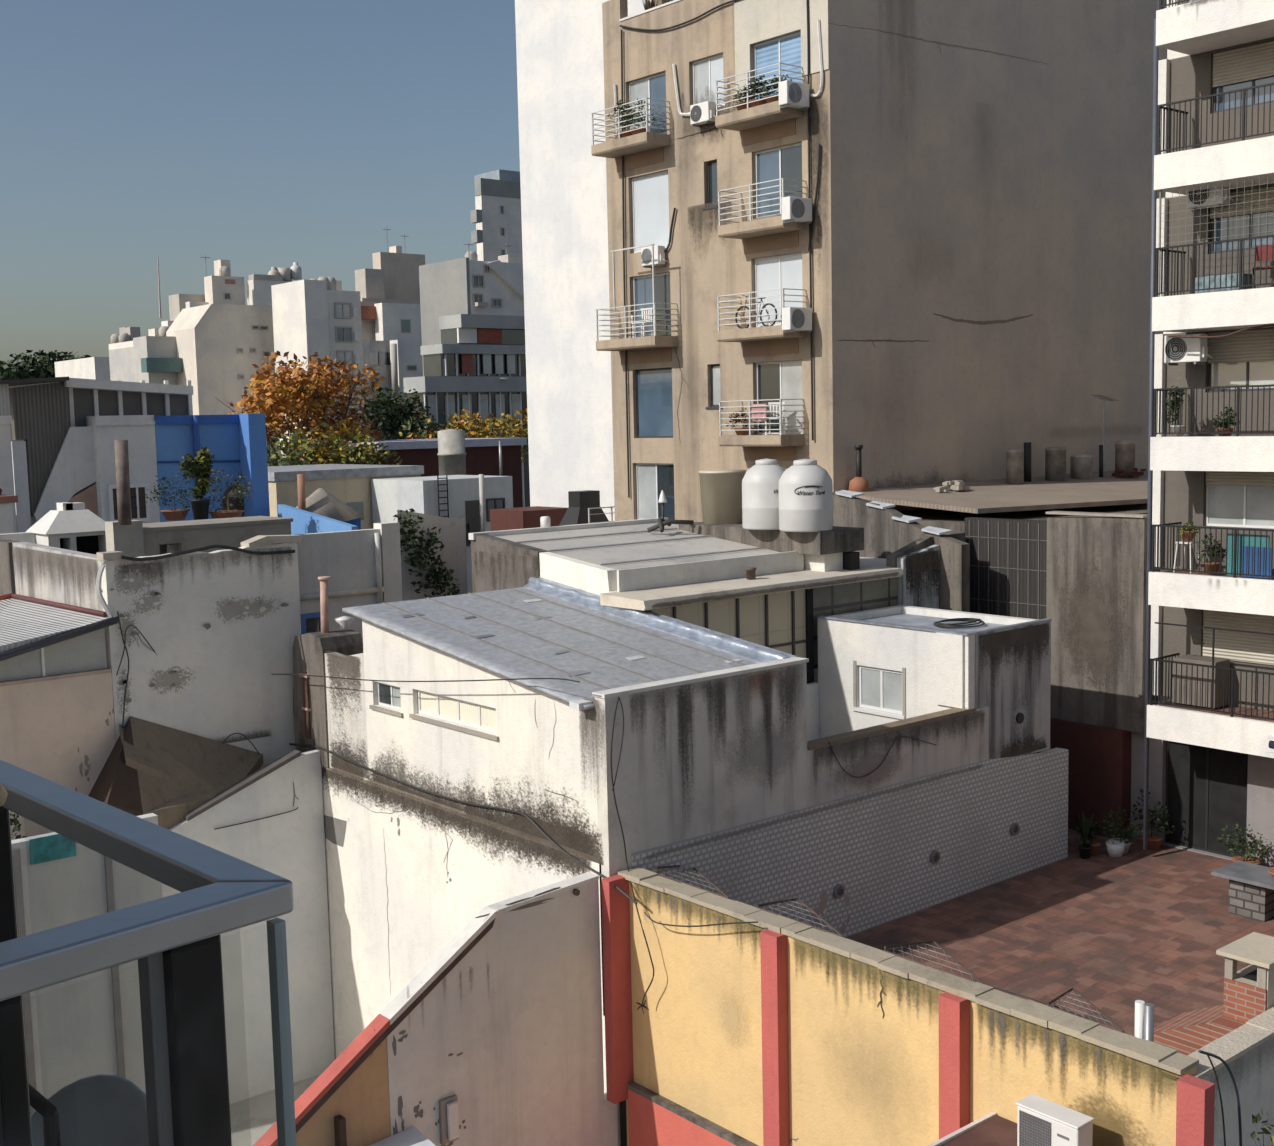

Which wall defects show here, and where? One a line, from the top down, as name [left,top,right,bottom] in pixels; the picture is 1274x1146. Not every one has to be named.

crack [828,23,1049,65]
peeling [204,597,289,630]
peeling [101,569,164,726]
peeling [149,666,194,693]
damp [678,693,693,777]
damp [707,683,726,730]
damp [741,670,798,774]
damp [1001,705,1046,758]
damp [298,651,606,876]
damp [820,954,931,1010]